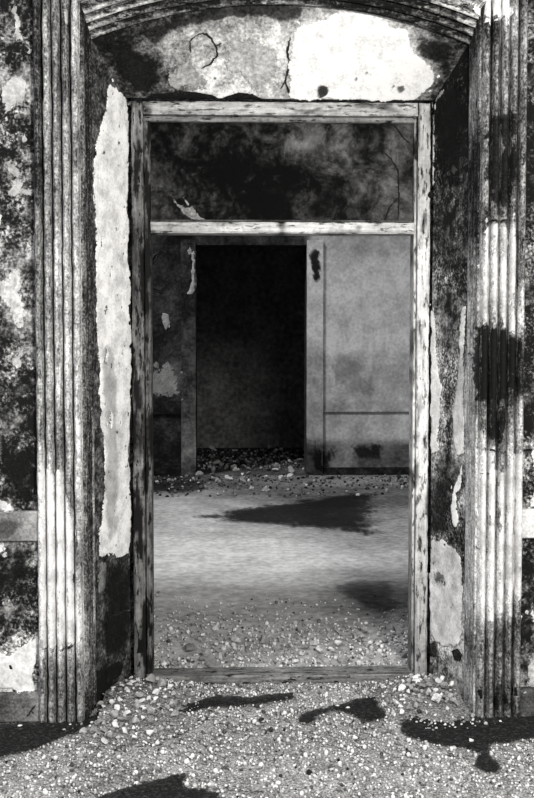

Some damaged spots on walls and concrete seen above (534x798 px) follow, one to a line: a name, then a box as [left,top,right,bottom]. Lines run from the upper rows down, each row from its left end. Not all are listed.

crack [189,32,222,69]
crack [281,37,291,97]
peeling [148,12,444,185]
damp [435,81,462,184]
peeling [187,248,197,294]
damp [309,249,321,280]
peeling [93,78,133,594]
damp [0,449,34,501]
peeling [0,446,85,693]
damp [431,480,452,536]
peeling [427,539,465,661]
peeling [475,442,534,622]